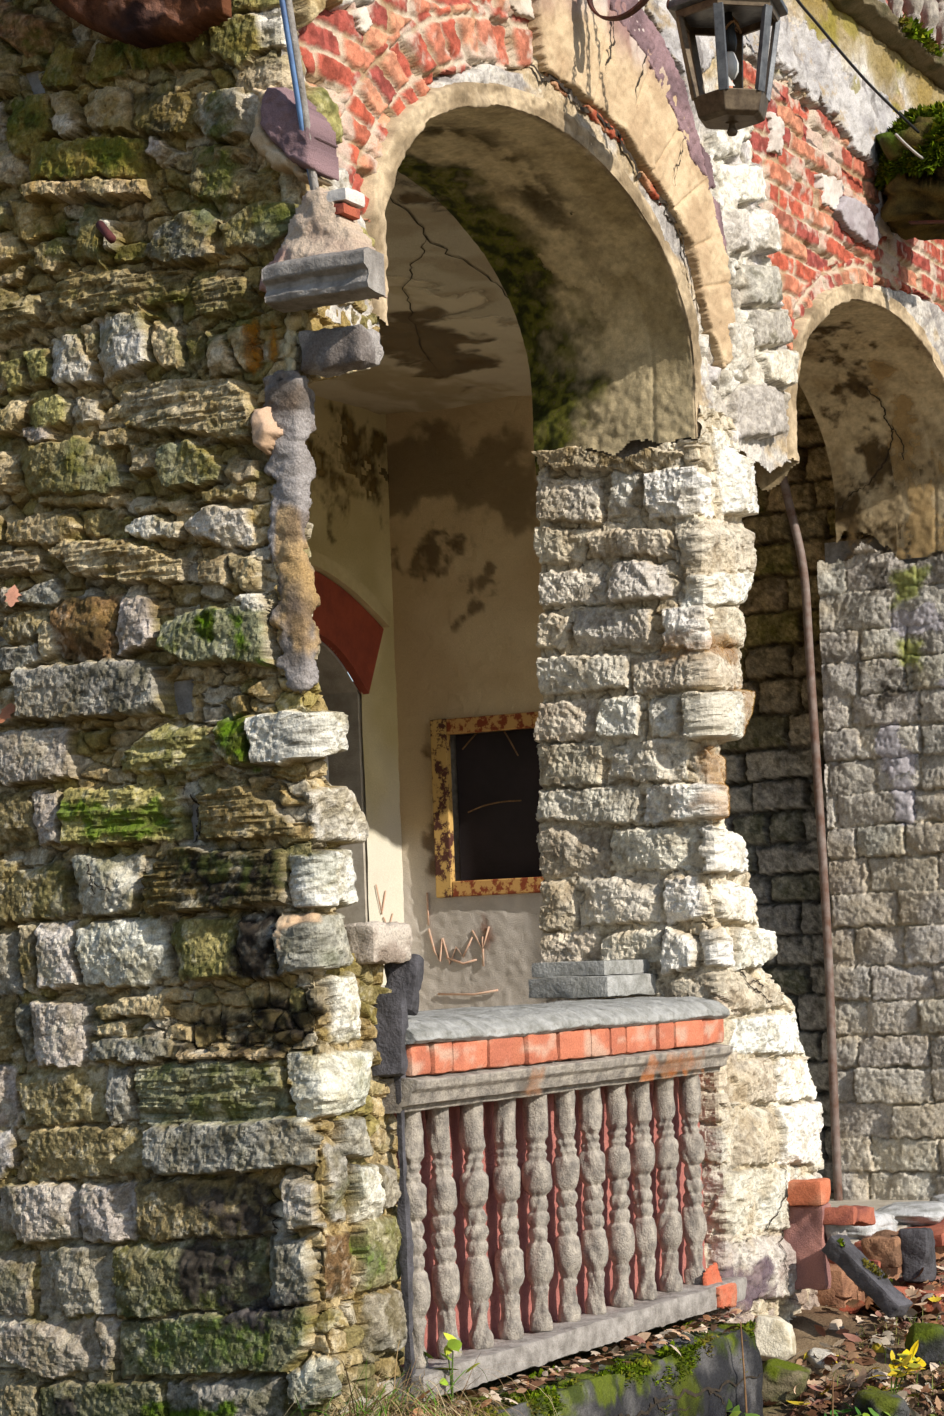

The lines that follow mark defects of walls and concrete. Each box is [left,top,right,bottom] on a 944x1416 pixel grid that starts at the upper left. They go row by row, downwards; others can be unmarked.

spalling [250,0,534,379]
crack [390,197,509,376]
flaking render [609,0,727,250]
spalling [729,15,944,350]
damp [392,530,465,578]
damp [453,563,494,628]